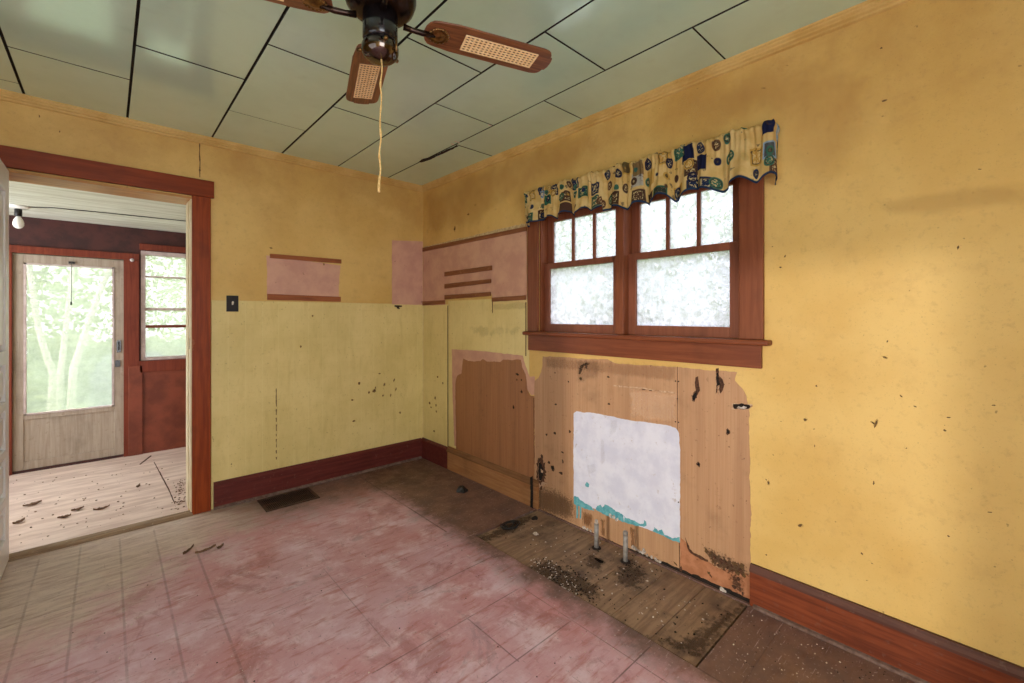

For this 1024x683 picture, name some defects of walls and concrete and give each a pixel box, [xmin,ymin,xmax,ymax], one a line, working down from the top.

peeling [437,349,753,589]
damp [707,550,746,592]